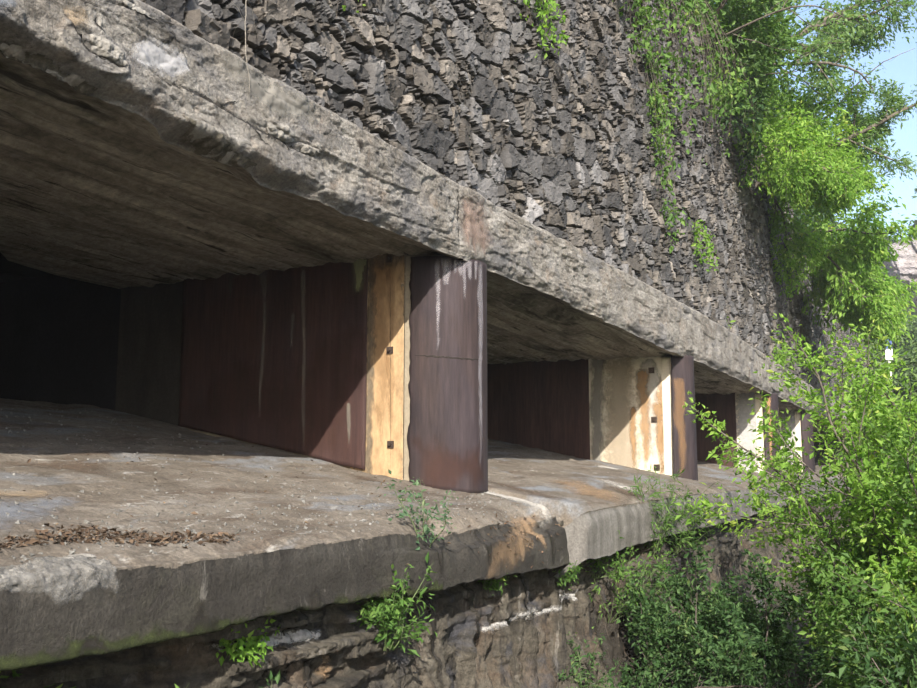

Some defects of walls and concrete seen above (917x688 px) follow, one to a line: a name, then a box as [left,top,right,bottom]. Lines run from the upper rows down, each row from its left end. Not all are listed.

corrosion [630,369,664,473]
corrosion [495,519,545,562]